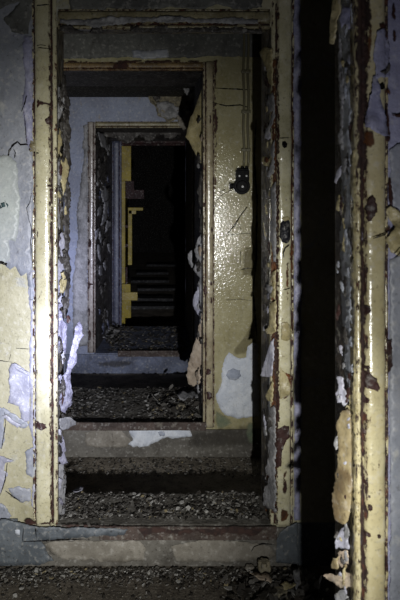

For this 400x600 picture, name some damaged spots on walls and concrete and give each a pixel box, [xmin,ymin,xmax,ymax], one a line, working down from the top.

peeling [0,0,36,507]
crack [8,96,39,158]
peeling [58,70,84,515]
peeling [0,503,146,566]
spalling [84,430,192,448]
spalling [95,88,203,404]
peeling [170,0,302,565]
rust [271,59,294,494]
peeling [323,0,360,600]
rust [356,0,387,578]
peeling [373,144,400,600]
rust [385,330,393,373]